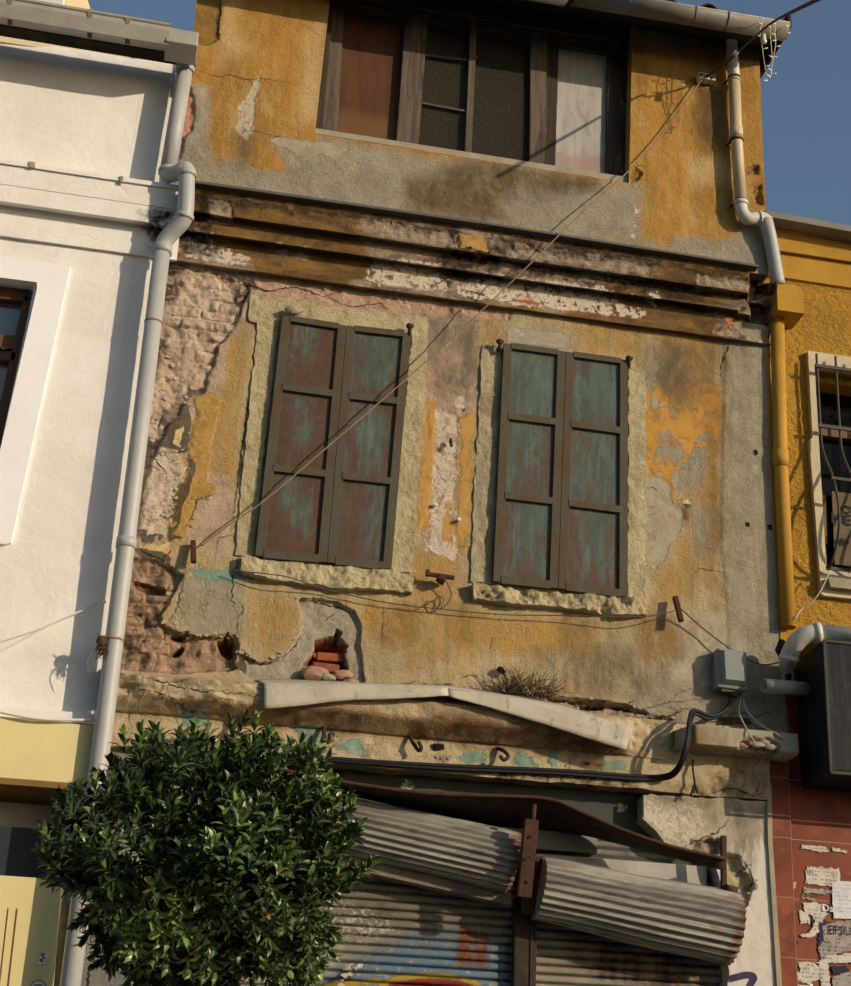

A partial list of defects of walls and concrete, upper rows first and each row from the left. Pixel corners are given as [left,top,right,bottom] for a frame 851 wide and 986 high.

peeling [194,0,222,46]
peeling [235,71,261,140]
crack [210,270,390,310]
flaking render [694,273,775,344]
flaking render [120,198,661,683]
peeling [645,357,723,569]
crack [713,769,764,797]
peeling [644,797,759,908]